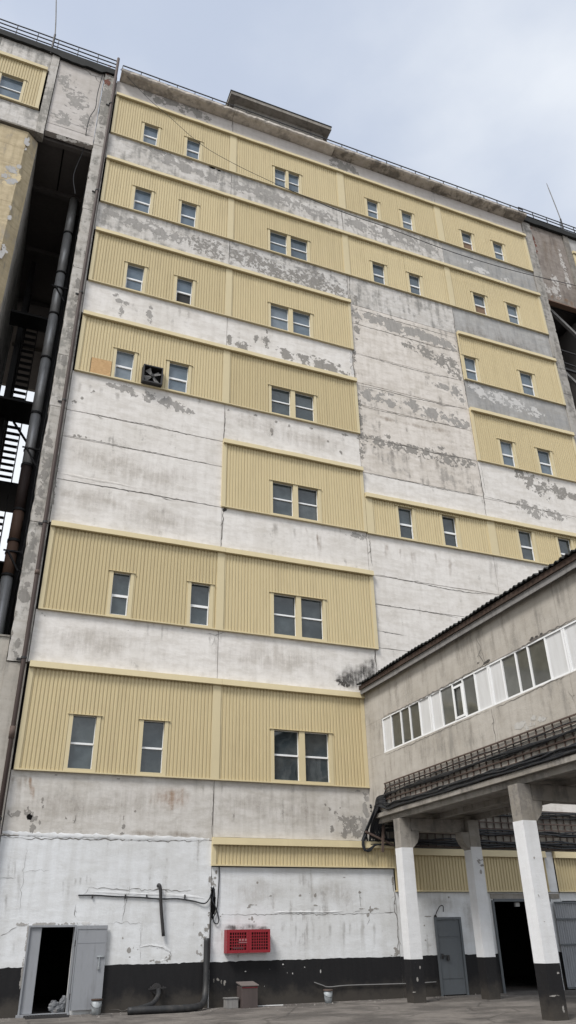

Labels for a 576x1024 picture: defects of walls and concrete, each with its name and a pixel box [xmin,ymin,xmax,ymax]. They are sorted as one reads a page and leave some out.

peeling [51,66,111,145]
peeling [1,164,21,187]
peeling [142,147,439,254]
peeling [103,207,545,418]
peeling [342,388,476,468]
peeling [514,469,576,521]
peeling [324,790,369,839]
crack [1,791,215,936]